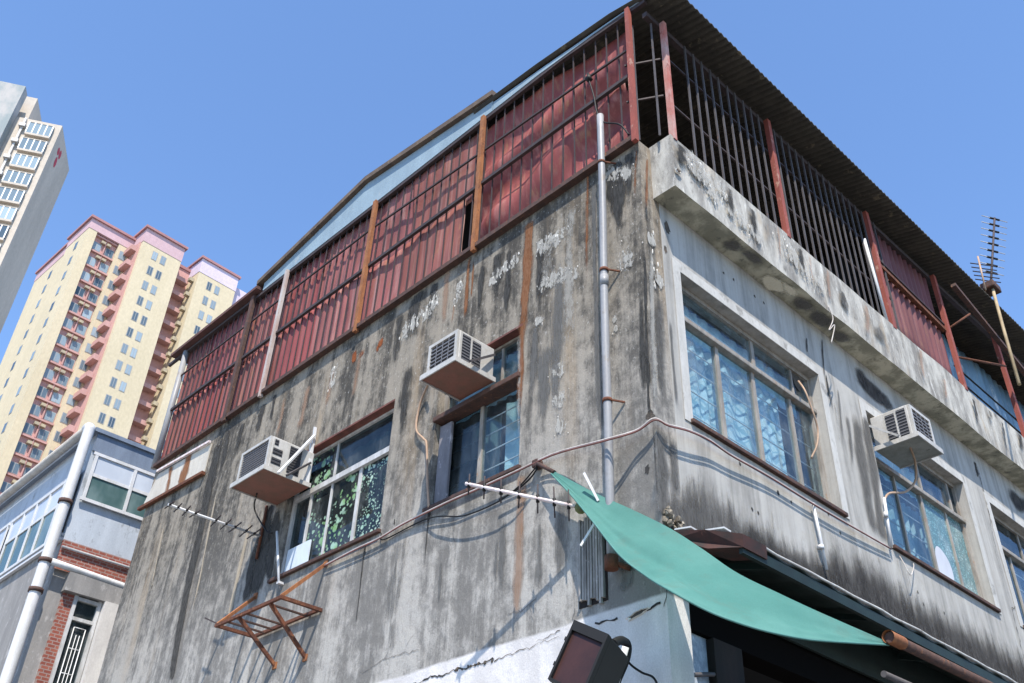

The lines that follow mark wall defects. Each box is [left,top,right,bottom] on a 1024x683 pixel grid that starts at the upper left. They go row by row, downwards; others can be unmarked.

peeling [399,293,439,341]
damp [477,251,511,310]
rust [517,222,533,412]
damp [518,213,574,415]
peeling [536,226,570,257]
peeling [540,265,579,293]
damp [592,153,633,423]
damp [639,257,677,413]
damp [170,395,280,679]
rust [514,478,525,608]
damp [653,431,1024,683]
crack [415,598,618,683]